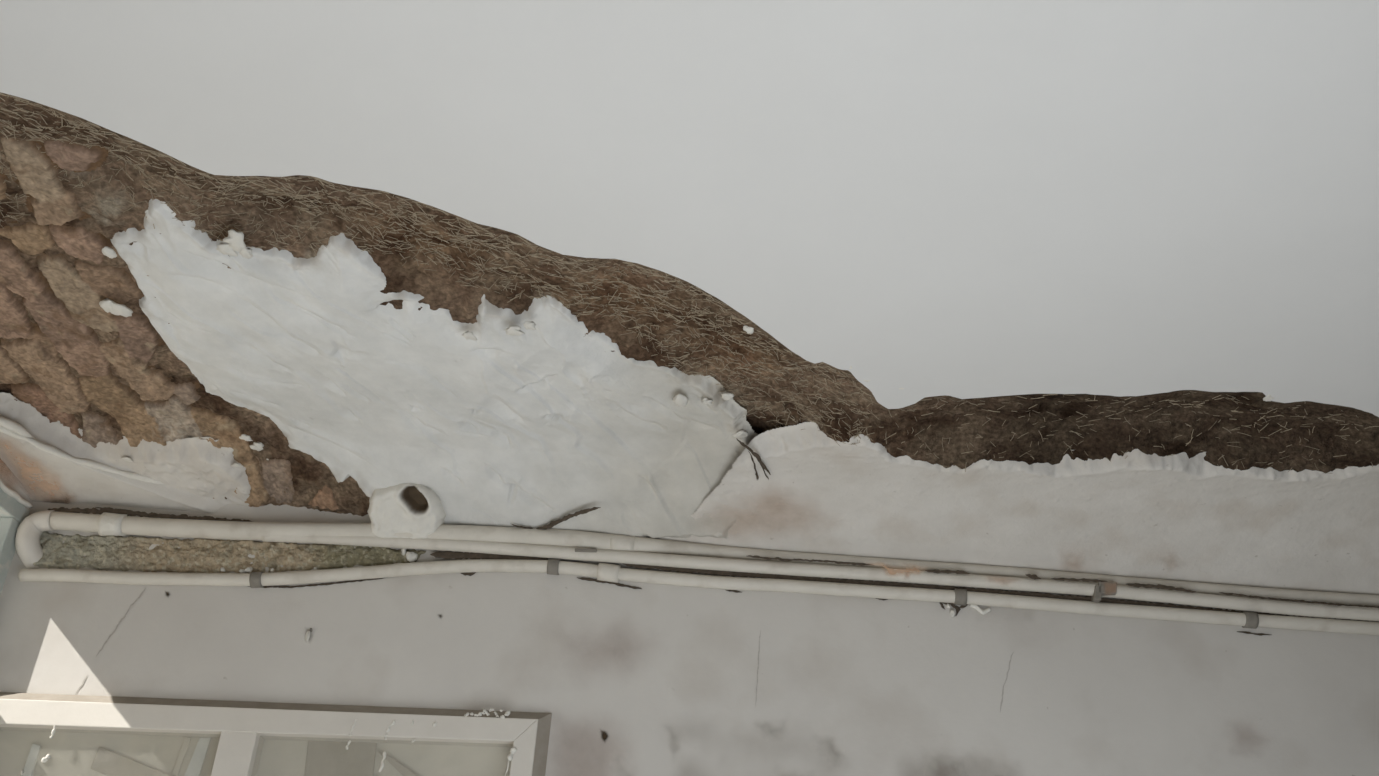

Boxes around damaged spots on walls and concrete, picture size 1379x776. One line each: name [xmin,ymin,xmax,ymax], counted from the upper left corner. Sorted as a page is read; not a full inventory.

flaking render [0,136,339,510]
crack [75,588,146,695]